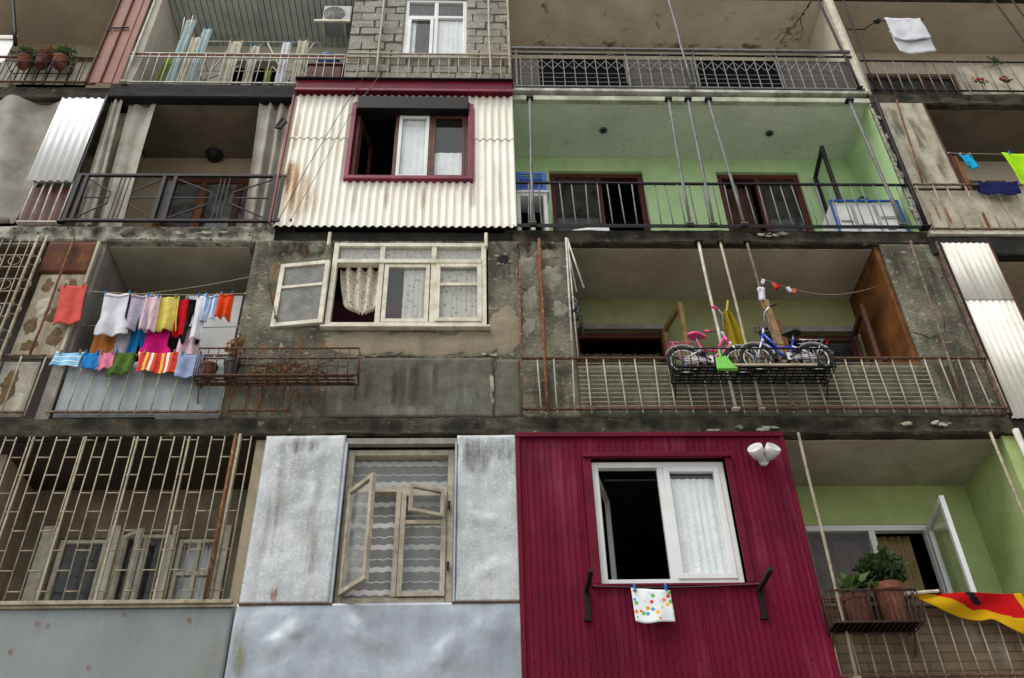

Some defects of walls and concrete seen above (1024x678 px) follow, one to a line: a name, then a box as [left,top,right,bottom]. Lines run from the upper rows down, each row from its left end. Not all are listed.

crack [775,1,812,44]